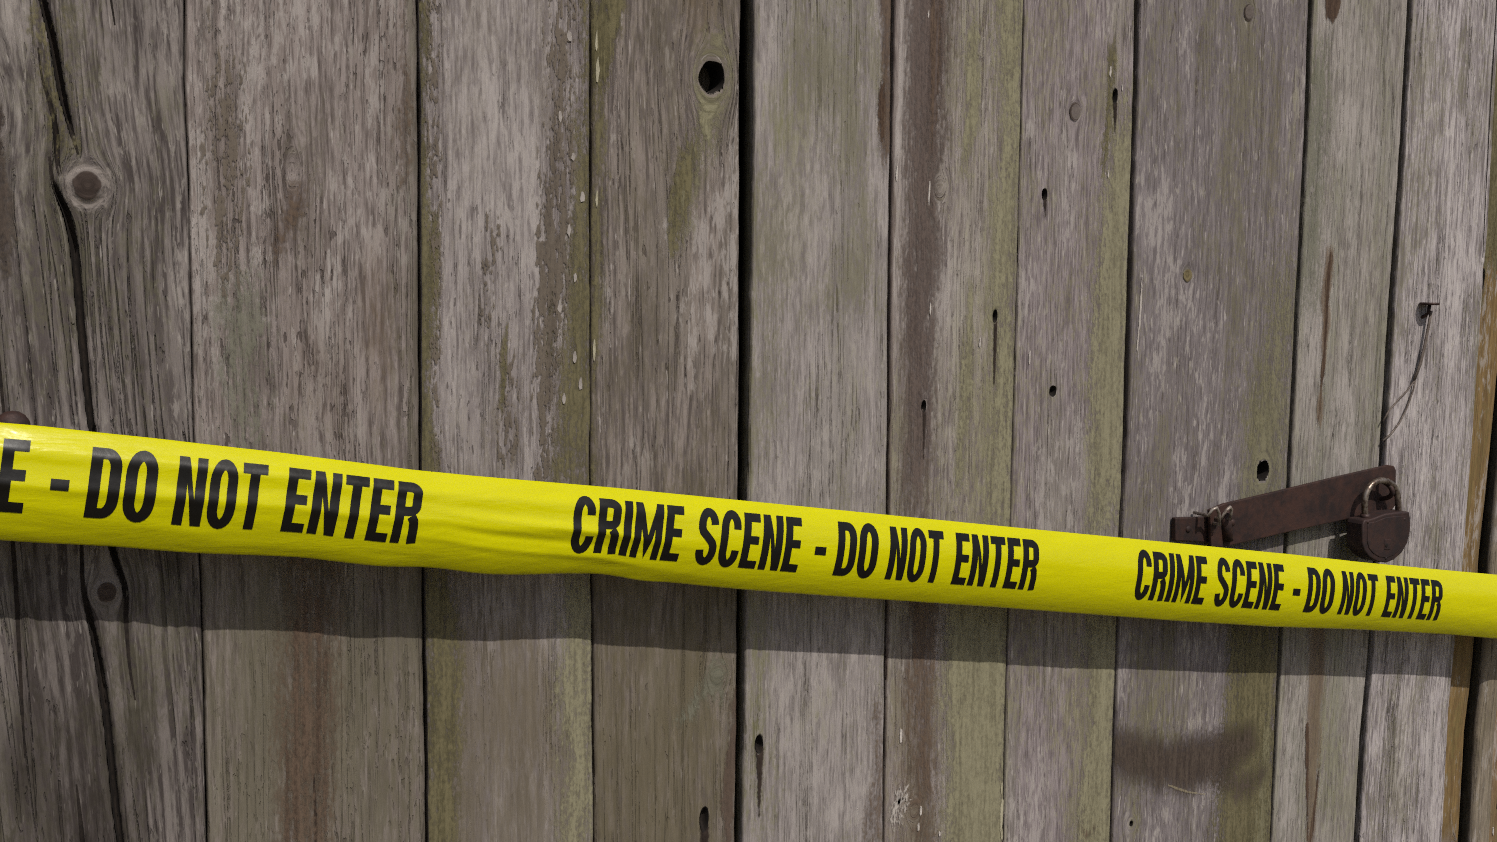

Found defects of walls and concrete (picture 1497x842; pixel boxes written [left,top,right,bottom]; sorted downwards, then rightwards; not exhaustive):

rust [1325,0,1341,23]
crack [37,0,96,432]
crack [0,360,8,413]
crack [11,541,26,758]
crack [76,545,136,842]